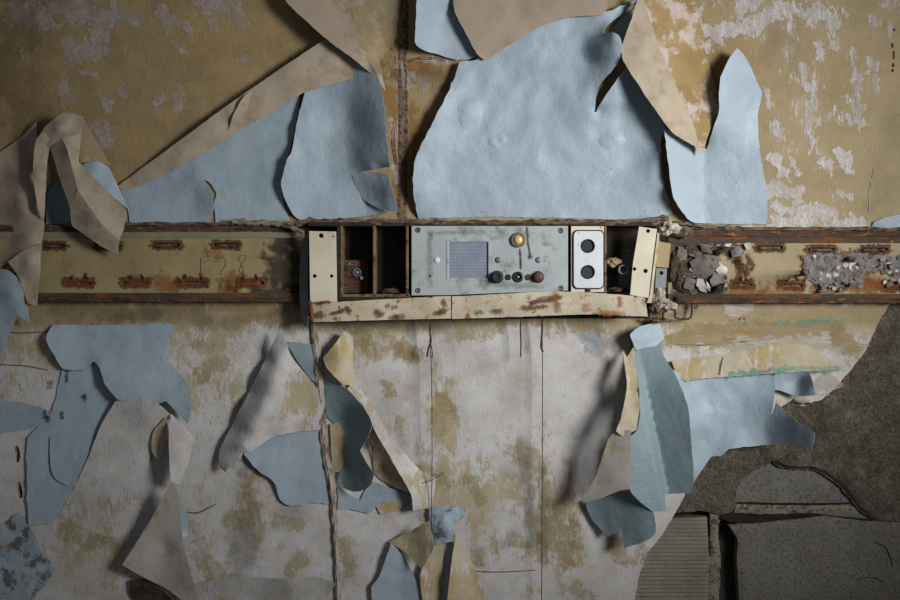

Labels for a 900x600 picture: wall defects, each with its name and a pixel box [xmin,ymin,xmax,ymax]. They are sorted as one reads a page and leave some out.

peeling [0,0,900,355]
corrosion [60,273,96,289]
corrosion [150,240,184,251]
corrosion [119,271,269,293]
corrosion [308,300,352,322]
water stain [444,319,504,342]
corrosion [523,292,562,312]
corrosion [729,243,900,299]
spalling [582,242,900,600]
peeling [0,324,336,600]
peeling [219,329,487,600]
water stain [493,505,585,571]